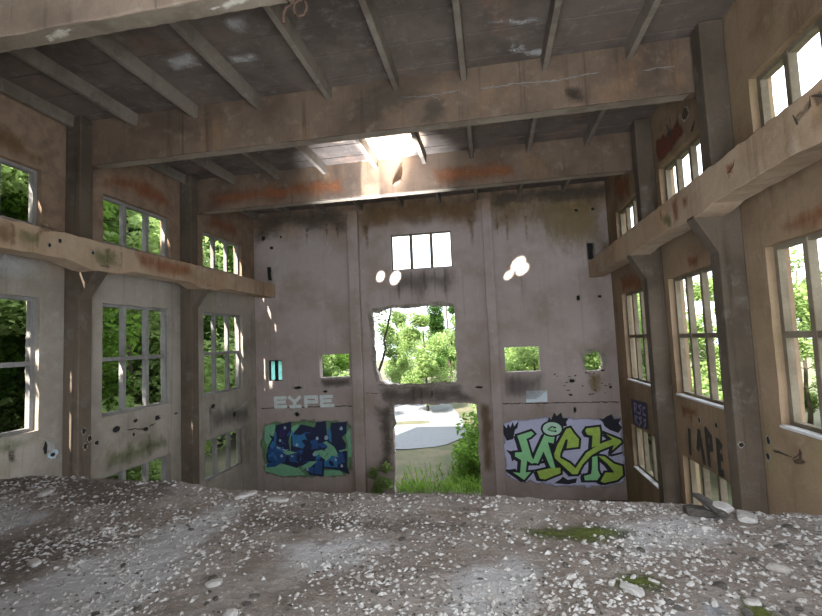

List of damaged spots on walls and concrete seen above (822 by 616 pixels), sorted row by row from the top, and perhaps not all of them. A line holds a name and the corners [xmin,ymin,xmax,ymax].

water stain [363,200,474,229]
water stain [494,187,605,239]
spalling [367,301,458,389]